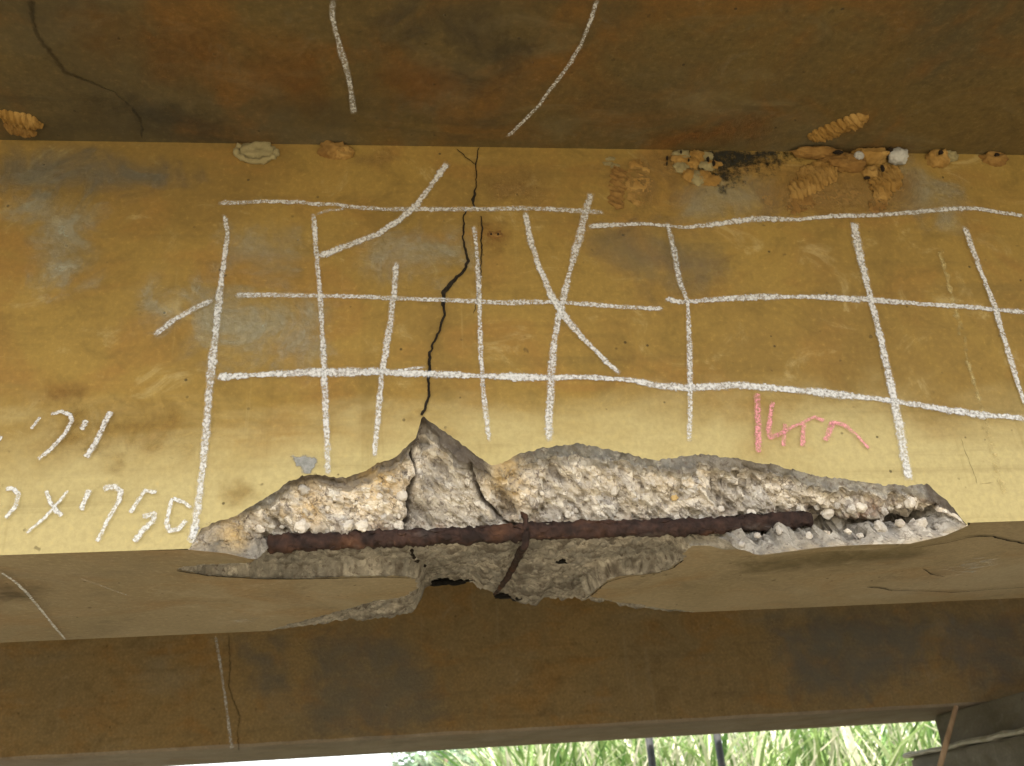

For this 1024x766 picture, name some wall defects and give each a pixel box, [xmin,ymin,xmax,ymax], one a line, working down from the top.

crack [420,147,483,415]
spalling [178,417,968,631]